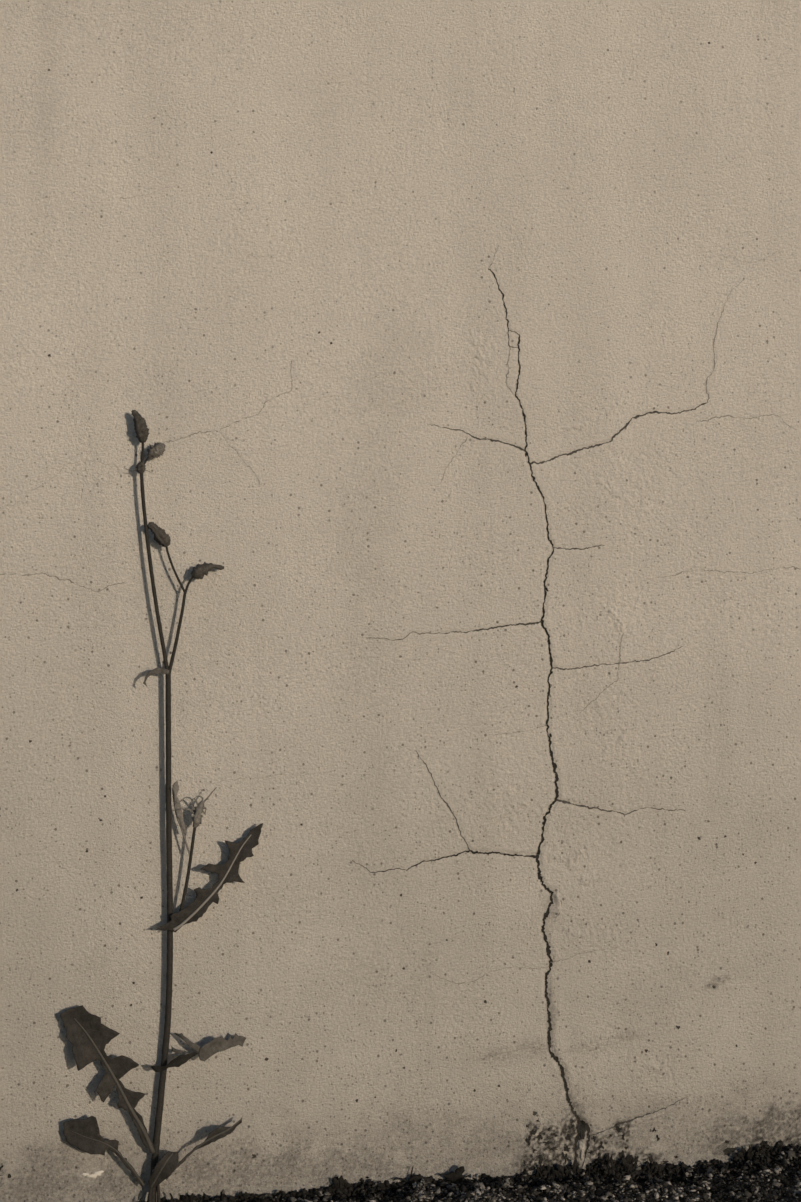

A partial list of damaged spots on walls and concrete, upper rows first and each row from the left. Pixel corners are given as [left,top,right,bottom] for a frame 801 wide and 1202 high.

crack [352,244,799,1167]